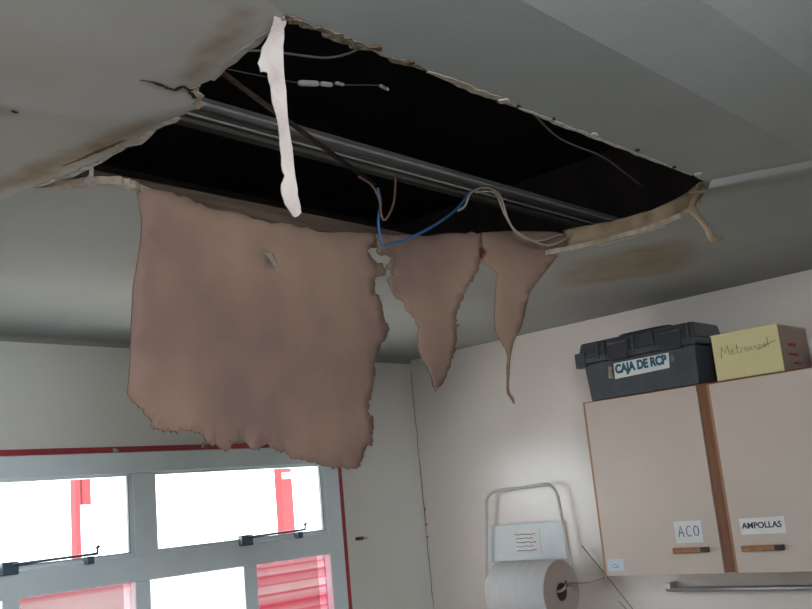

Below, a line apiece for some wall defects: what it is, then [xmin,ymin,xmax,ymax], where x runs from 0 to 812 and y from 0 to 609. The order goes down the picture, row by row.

crack [140,80,201,99]
spalling [189,85,205,109]
peeling [212,15,382,217]
spalling [388,57,702,176]
spalling [32,117,181,189]